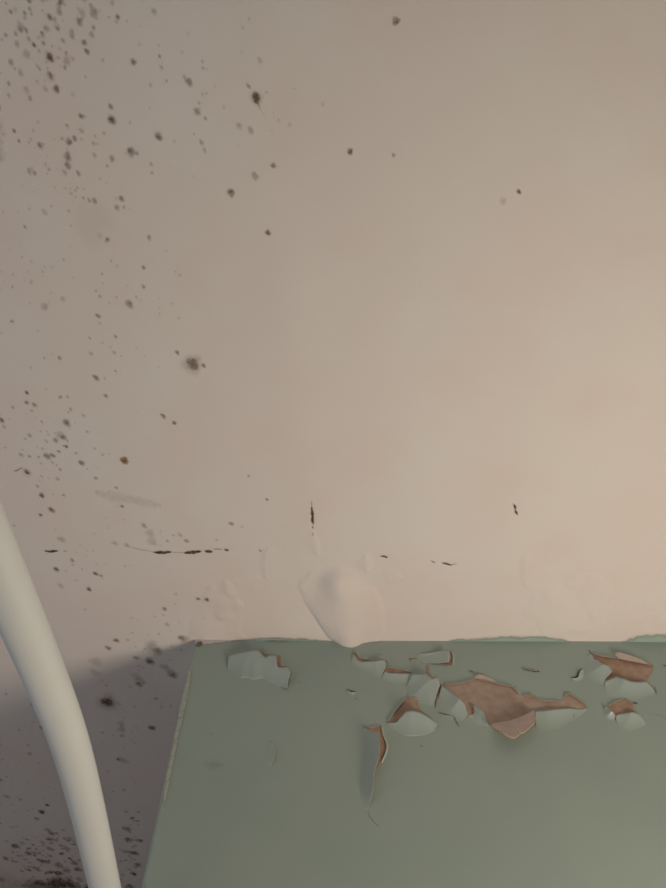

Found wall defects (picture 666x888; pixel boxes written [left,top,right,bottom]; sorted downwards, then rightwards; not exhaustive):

peeling [227,649,291,688]
peeling [351,649,589,810]
peeling [572,650,666,731]